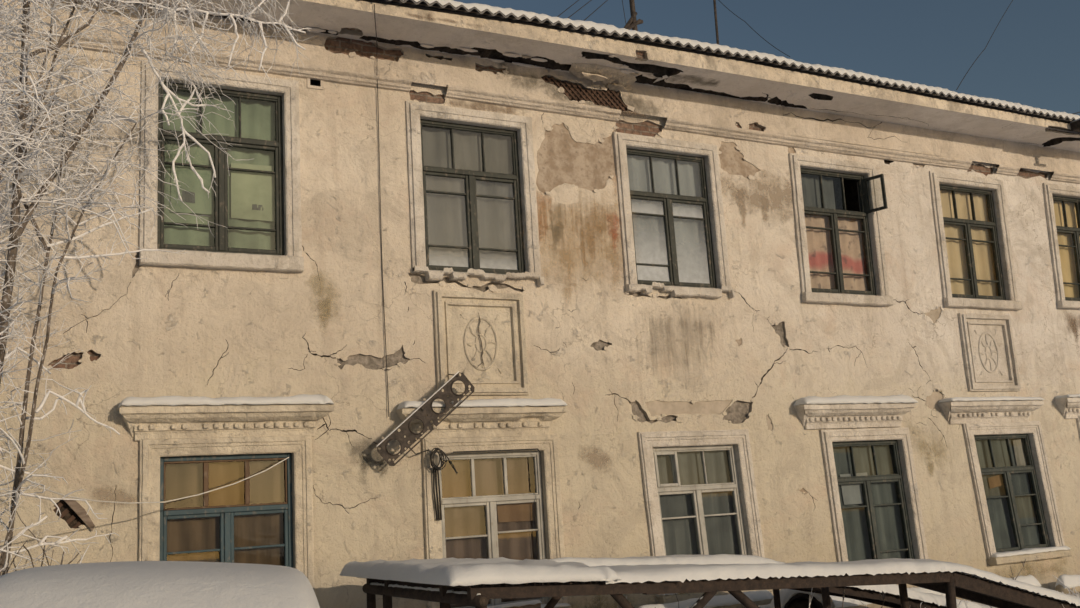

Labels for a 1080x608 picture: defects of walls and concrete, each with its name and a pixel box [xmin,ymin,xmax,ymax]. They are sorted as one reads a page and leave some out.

spalling [324,34,408,62]
spalling [475,63,509,74]
spalling [409,88,445,104]
flaking render [536,106,663,195]
damp [728,175,793,223]
spalling [45,350,101,370]
crack [288,333,346,371]
spalling [335,345,411,370]
crack [752,345,866,398]
flaking render [627,395,774,431]
crack [315,414,372,443]
crack [313,487,378,514]